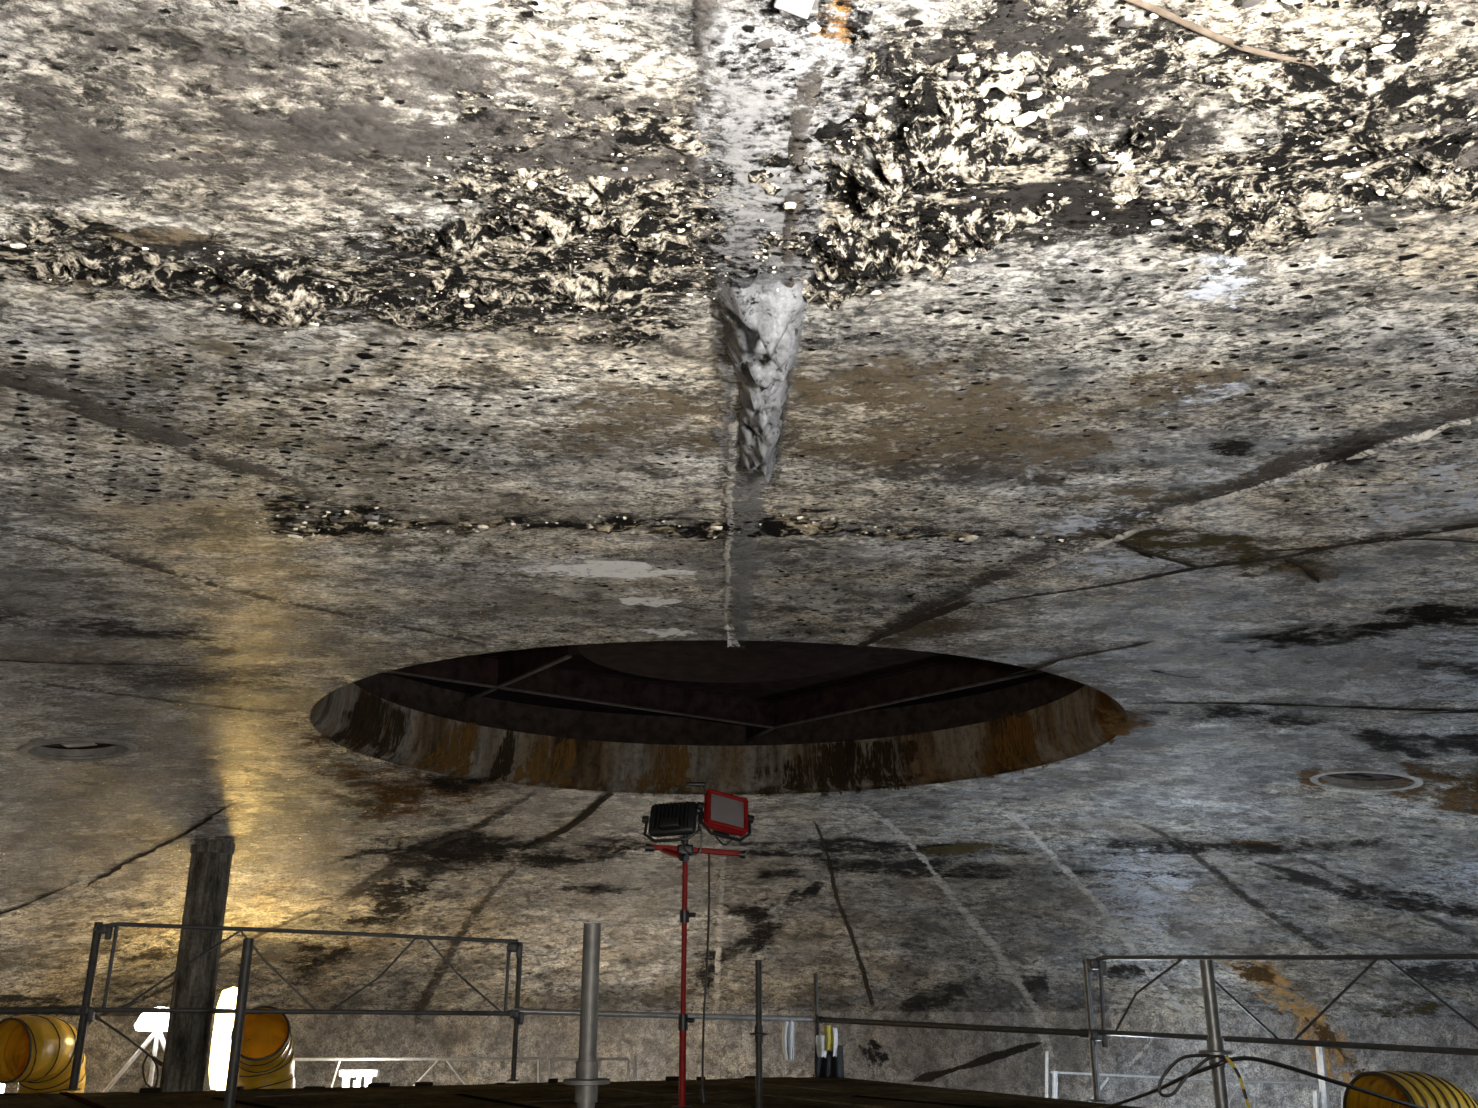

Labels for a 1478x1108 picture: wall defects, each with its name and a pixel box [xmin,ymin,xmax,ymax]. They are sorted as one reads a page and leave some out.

spalling [0,0,1478,349]
crack [980,523,1478,605]
water stain [1204,604,1478,716]
water stain [1144,706,1478,761]
rust [1298,767,1329,791]
rust [1390,762,1478,816]
crack [0,803,233,915]
rust [1219,960,1365,1084]